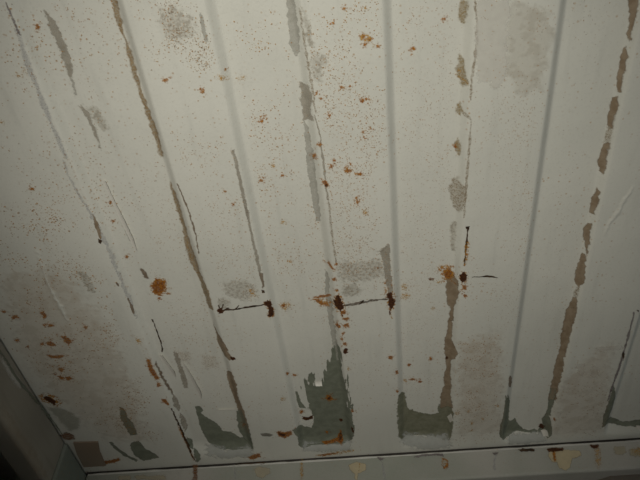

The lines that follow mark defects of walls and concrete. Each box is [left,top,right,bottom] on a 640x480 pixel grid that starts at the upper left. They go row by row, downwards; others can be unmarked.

peeling [111,0,163,156]
corrosion [322,0,381,50]
peeling [299,82,328,221]
corrosion [279,33,387,307]
corrosion [27,314,120,406]
corrosion [147,272,170,301]
peeling [170,184,213,310]
peeling [155,352,253,462]
peeling [292,271,354,451]
corrosion [335,310,349,354]
peeling [397,275,459,449]
peeling [499,223,592,444]